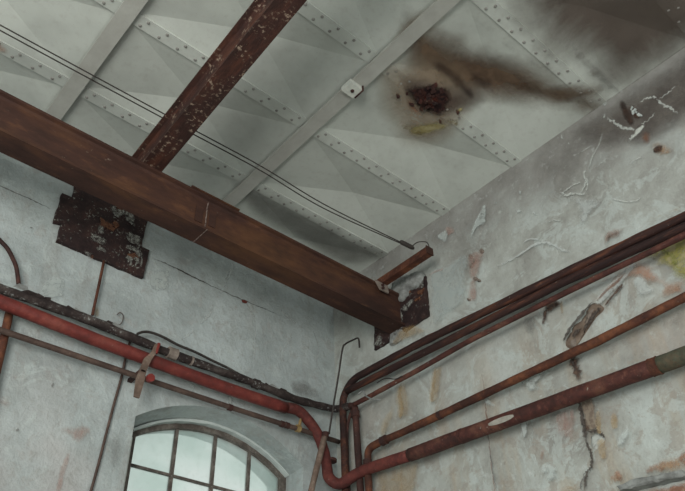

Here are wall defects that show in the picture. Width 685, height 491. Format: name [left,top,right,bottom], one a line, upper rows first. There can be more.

water stain [412,35,589,105]
crack [158,260,263,308]
spalling [558,266,633,354]
spalling [569,357,582,379]
spalling [578,399,605,488]